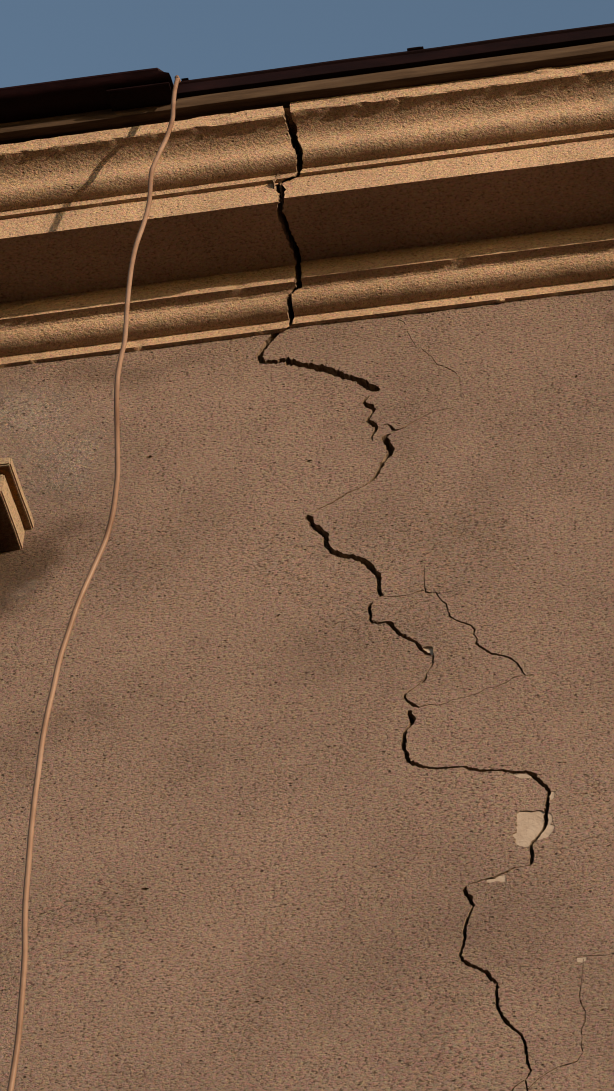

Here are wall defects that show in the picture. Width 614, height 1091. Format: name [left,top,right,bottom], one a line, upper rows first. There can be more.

crack [255,111,614,1091]
peeling [513,810,555,847]